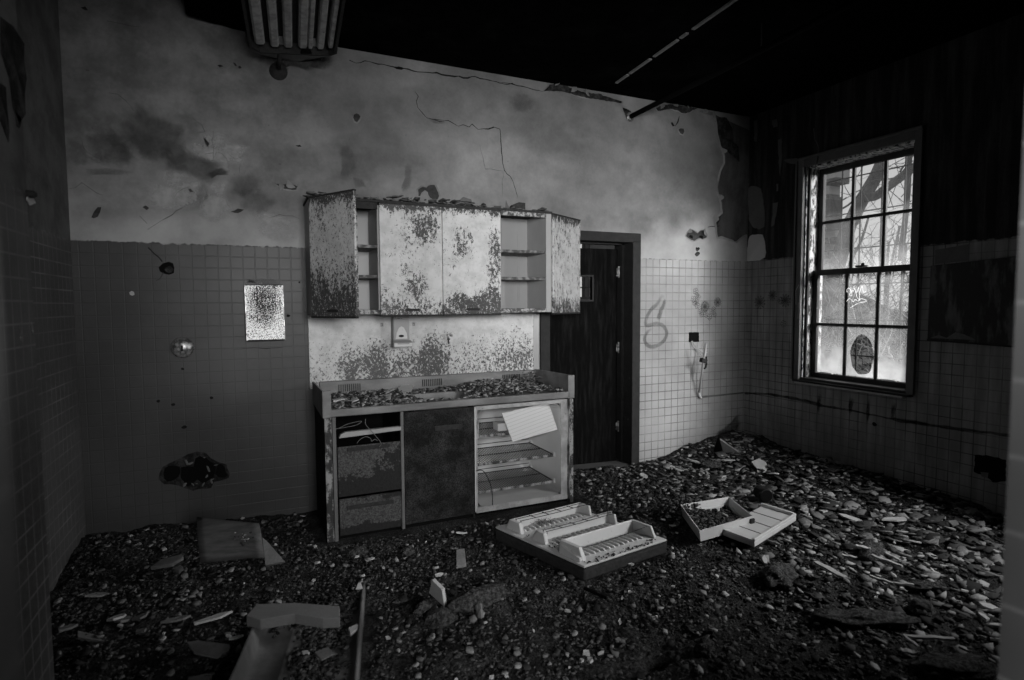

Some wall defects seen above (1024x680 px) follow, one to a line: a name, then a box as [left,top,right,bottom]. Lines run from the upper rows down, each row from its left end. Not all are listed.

crack [349,60,548,194]
flaking render [543,83,631,115]
water stain [152,136,240,218]
flaking render [655,103,783,261]
hole [159,452,230,491]
hole [974,455,1007,482]